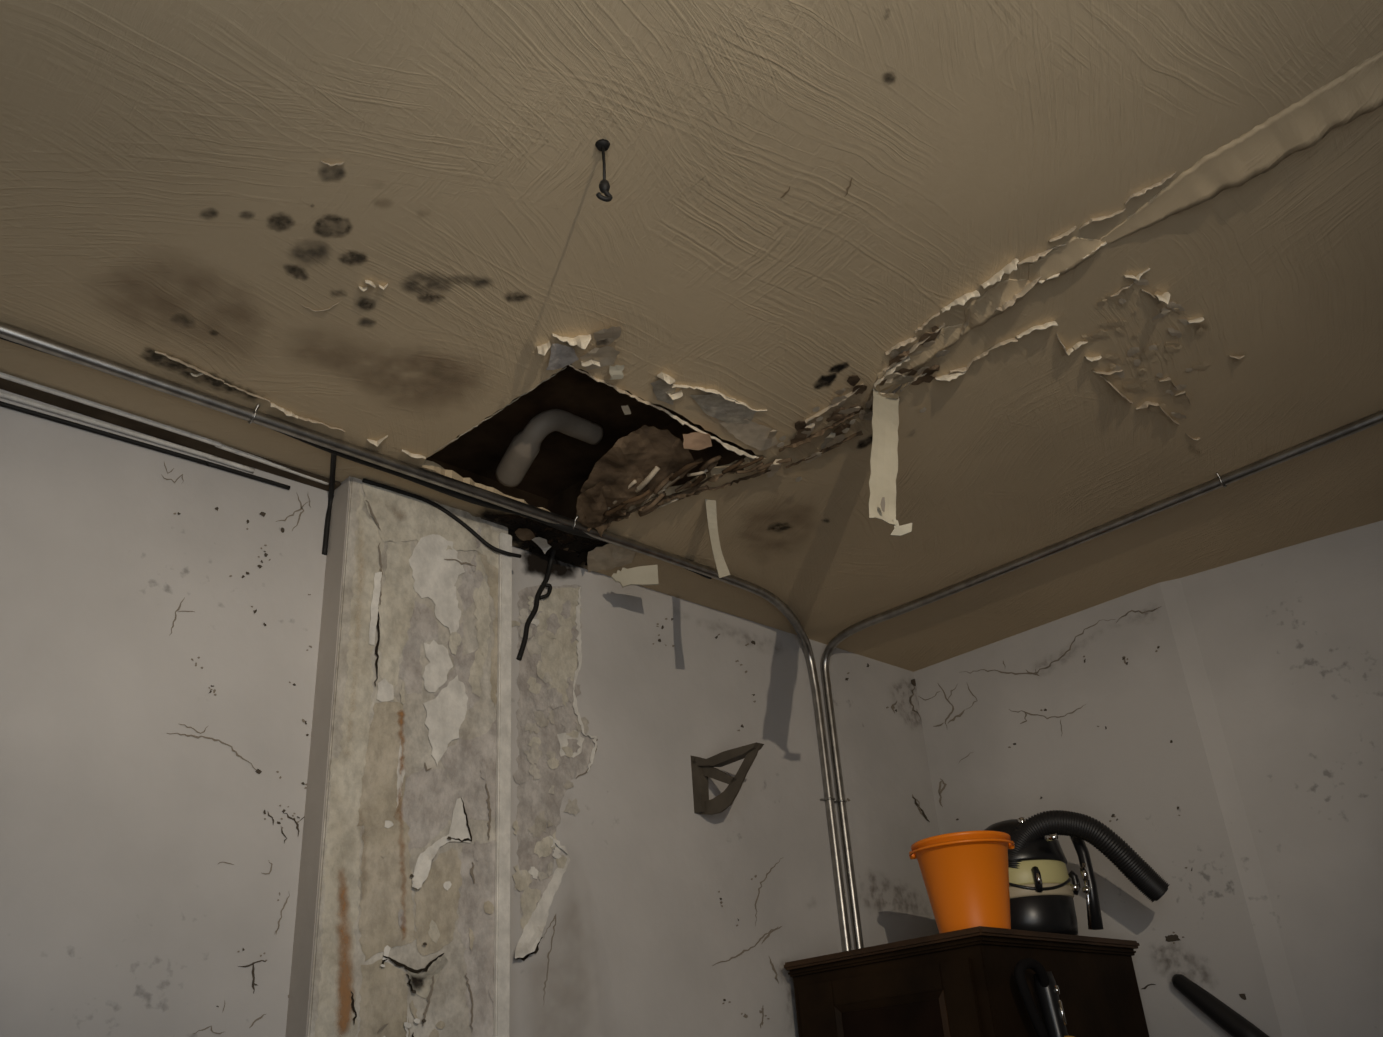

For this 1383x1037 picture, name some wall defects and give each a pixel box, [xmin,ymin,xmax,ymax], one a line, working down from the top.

water stain [270,216,291,230]
water stain [287,216,366,279]
water stain [358,299,373,324]
peeling [358,280,388,292]
flaking render [402,171,1212,478]
flaking render [144,349,346,433]
crack [260,492,311,533]
crack [891,606,1161,727]
crack [167,724,262,774]
peeling [315,483,636,1037]
crack [193,812,304,1034]
corrosion [339,885,352,1032]